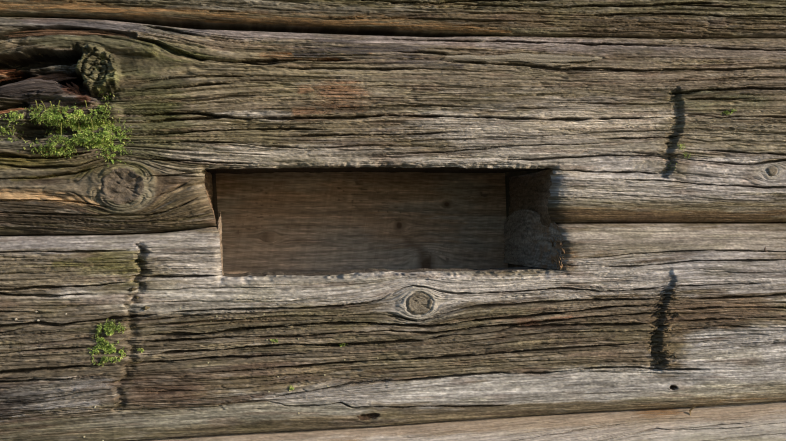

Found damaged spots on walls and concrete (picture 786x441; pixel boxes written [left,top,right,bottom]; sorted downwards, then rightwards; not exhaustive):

crack [142,272,214,280]
crack [0,282,786,409]